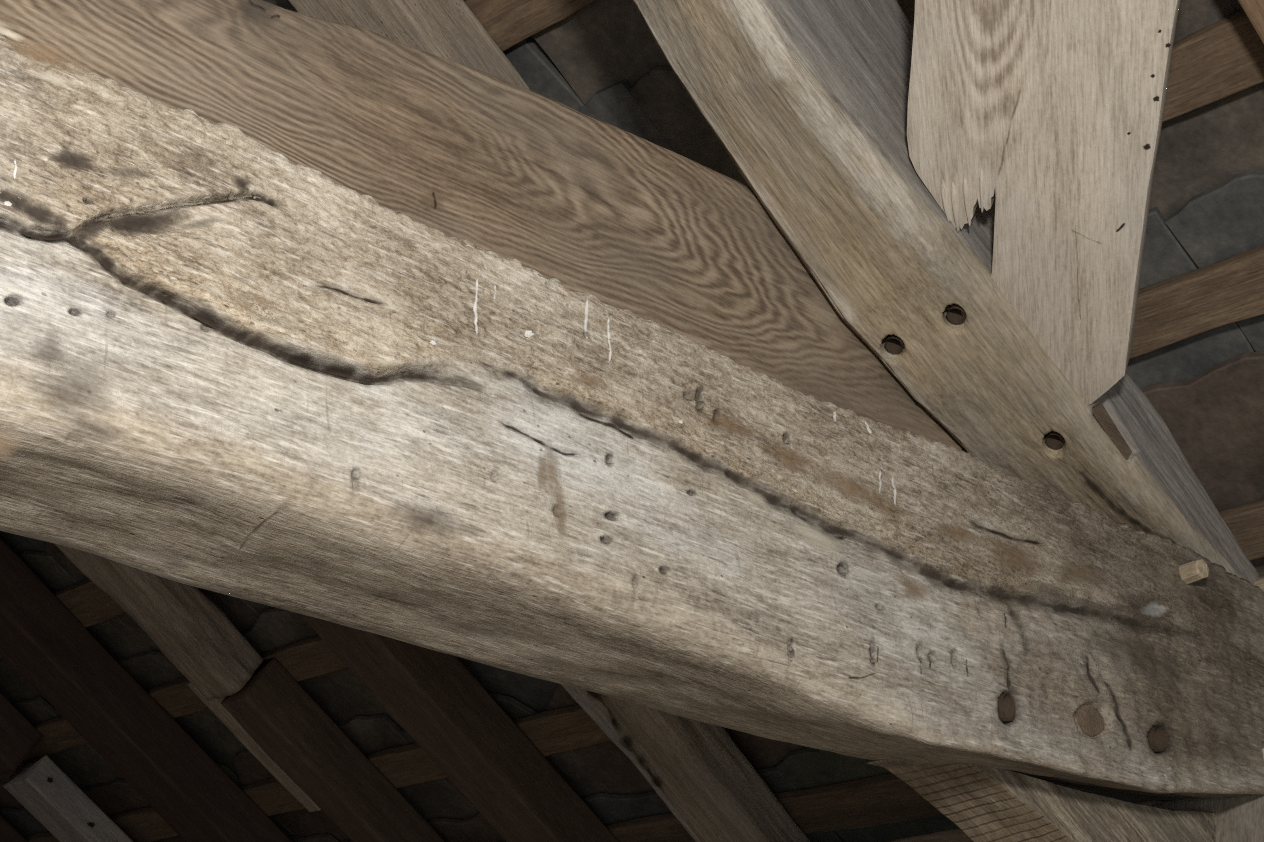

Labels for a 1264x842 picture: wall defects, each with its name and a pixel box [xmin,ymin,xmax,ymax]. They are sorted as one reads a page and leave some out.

crack [0,192,429,383]
crack [484,363,854,539]
crack [239,511,278,549]
crack [974,523,1039,544]
crack [886,550,1149,627]
crack [1087,666,1131,748]